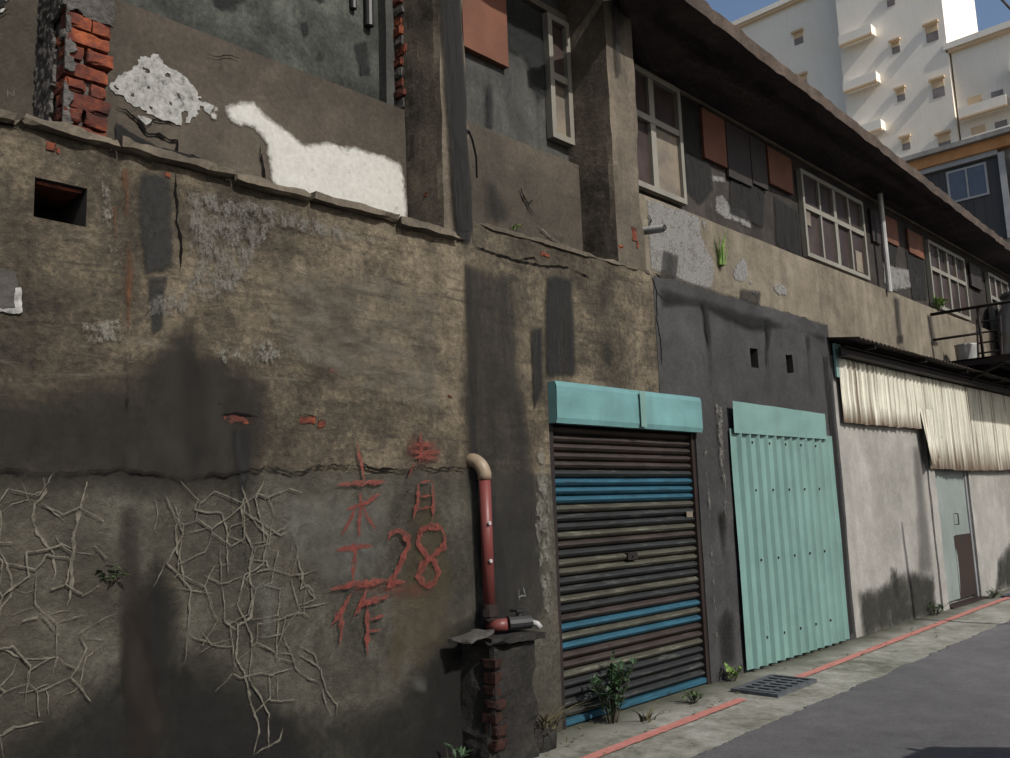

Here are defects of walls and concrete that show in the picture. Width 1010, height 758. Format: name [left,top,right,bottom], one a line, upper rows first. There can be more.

spalling [32,0,216,158]
flaking render [392,0,407,109]
spalling [0,287,23,314]
damp [0,336,288,491]
crack [174,175,187,268]
peeling [227,102,406,218]
damp [467,269,551,619]
damp [531,276,575,407]
peeling [618,199,714,289]
damp [824,357,937,635]
crack [0,456,468,758]
damp [10,515,486,758]